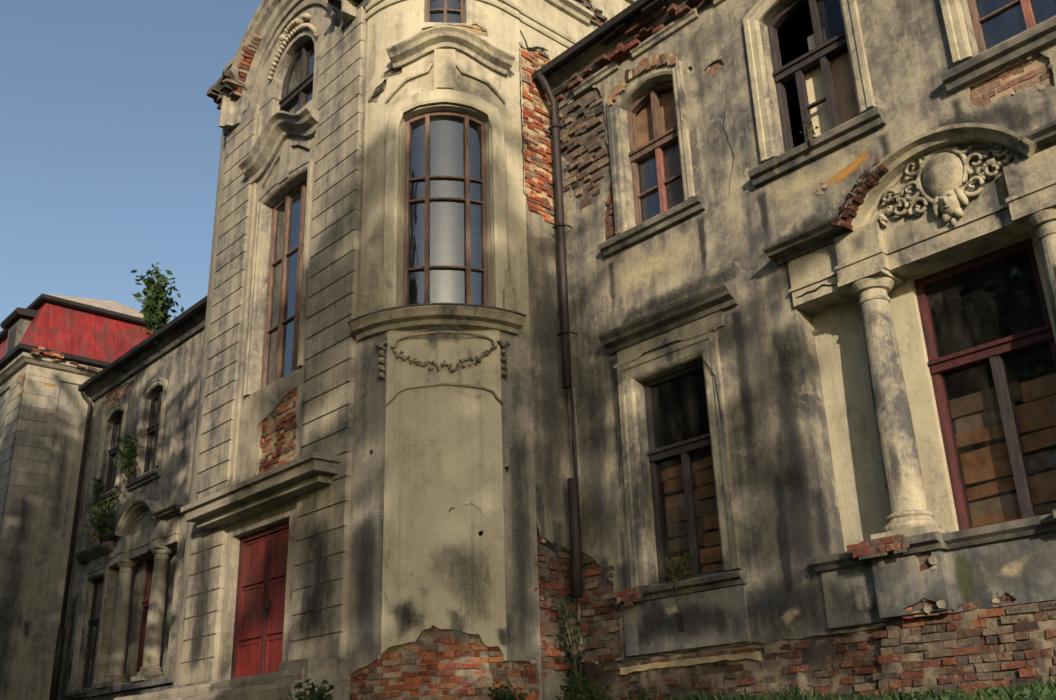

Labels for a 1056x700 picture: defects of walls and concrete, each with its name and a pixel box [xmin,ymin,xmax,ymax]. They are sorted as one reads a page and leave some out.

flaking render [574,0,608,27]
flaking render [969,54,1055,107]
flaking render [518,42,616,240]
flaking render [256,388,297,474]
damp [729,312,830,627]
damp [0,498,32,690]
flaking render [345,536,645,700]
peeling [782,609,798,624]
flaking render [847,534,937,571]
flaking render [902,598,952,619]
flaking render [992,592,1017,609]
peeling [1002,564,1022,575]